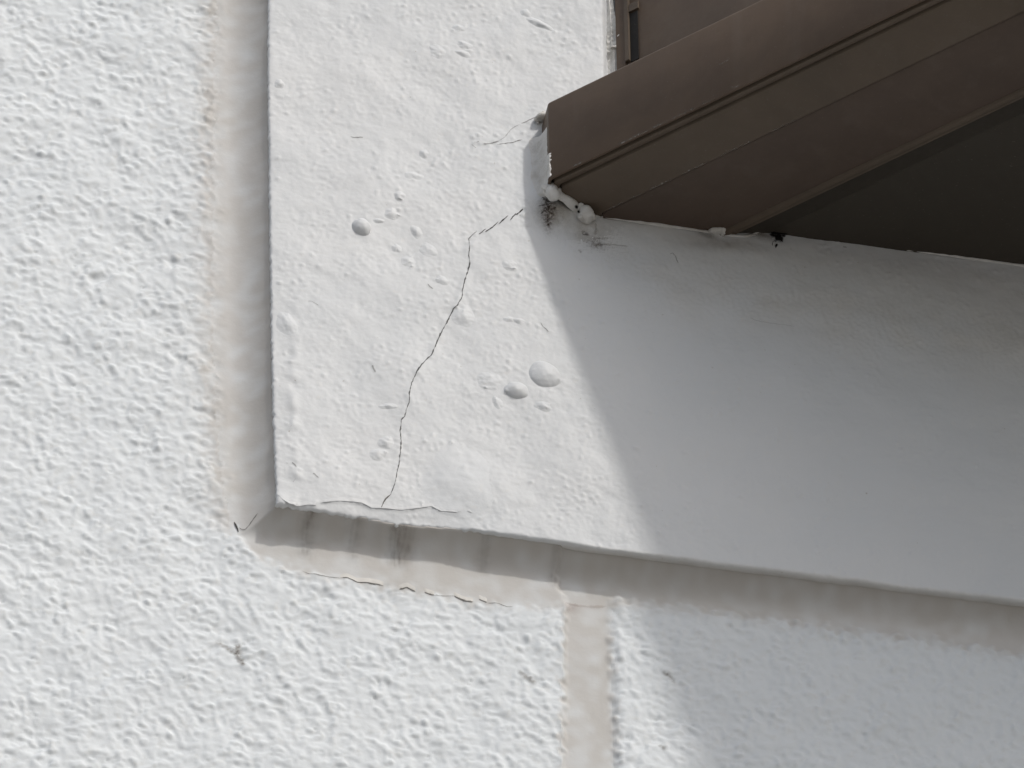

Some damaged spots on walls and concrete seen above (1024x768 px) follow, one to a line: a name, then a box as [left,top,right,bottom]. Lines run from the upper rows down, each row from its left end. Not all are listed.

crack [381,209,523,508]